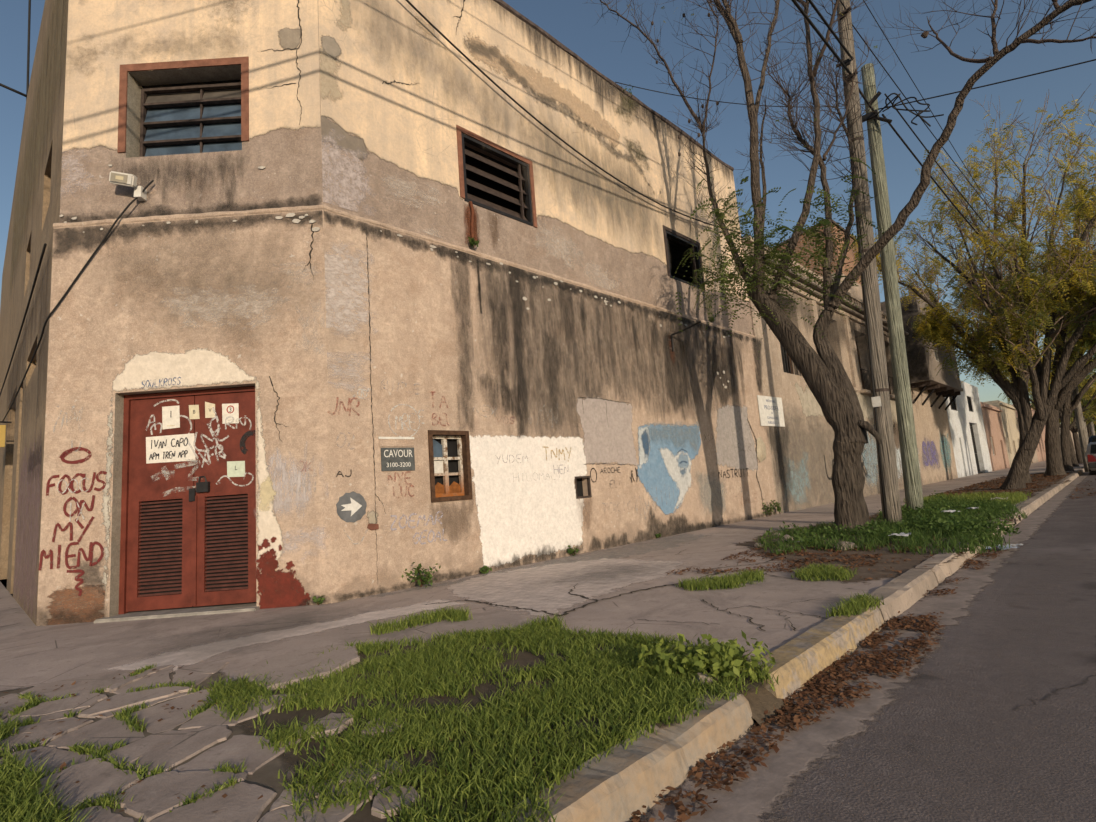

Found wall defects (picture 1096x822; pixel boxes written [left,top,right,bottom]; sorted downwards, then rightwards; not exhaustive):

crack [257,0,302,125]
peeling [319,47,342,100]
water stain [469,44,642,172]
crack [304,218,314,281]
rust [465,206,478,243]
water stain [457,262,742,434]
water stain [753,339,762,392]
crack [269,376,286,441]
flaking render [46,348,311,625]